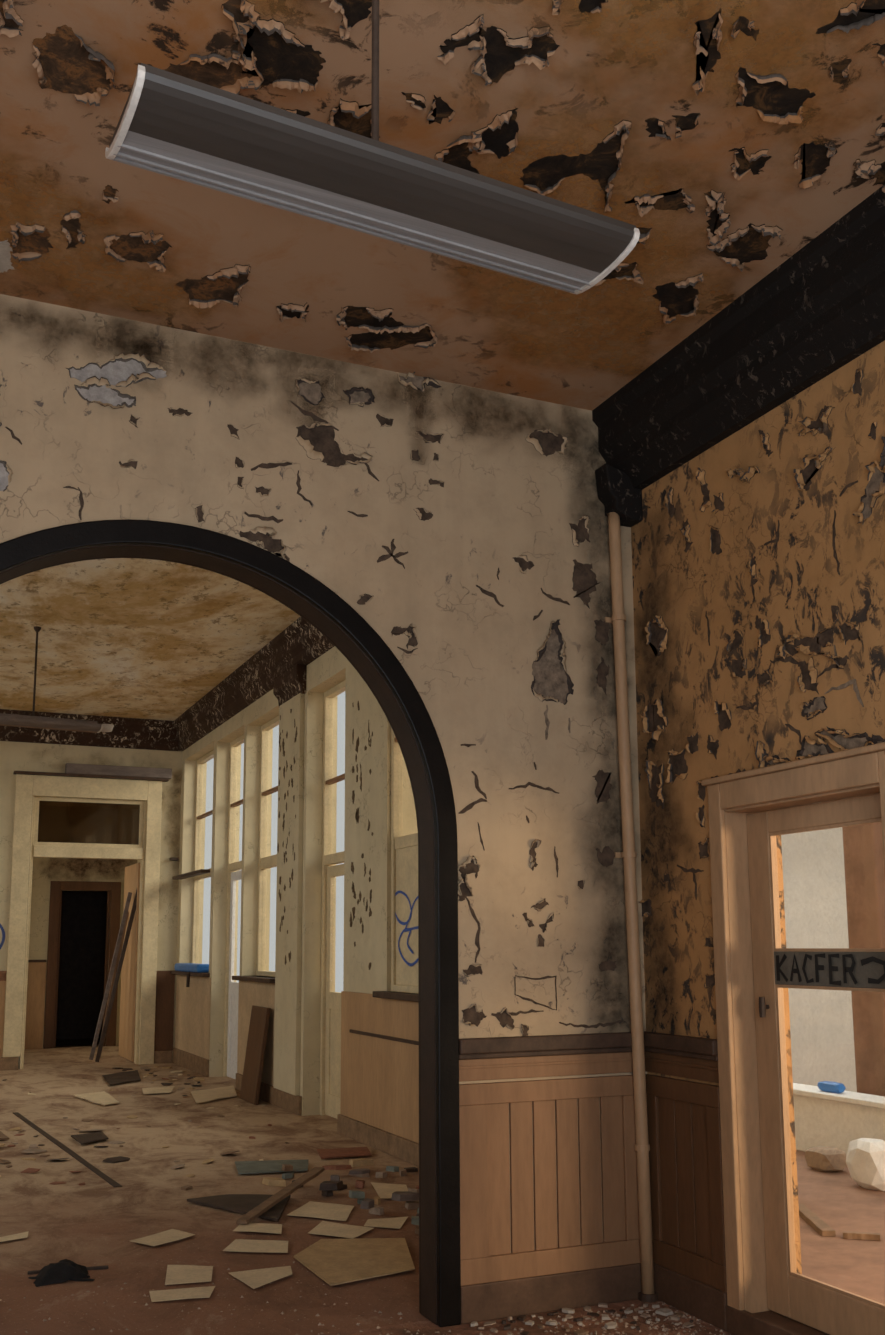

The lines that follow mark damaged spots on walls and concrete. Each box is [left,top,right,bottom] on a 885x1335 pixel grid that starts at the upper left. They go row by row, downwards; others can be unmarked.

peeling [0,0,115,106]
peeling [134,0,326,94]
peeling [435,108,519,174]
peeling [437,0,608,86]
peeling [735,67,816,124]
peeling [520,113,783,272]
water stain [9,310,167,363]
peeling [336,306,438,353]
water stain [454,387,572,455]
peeling [531,619,574,740]
peeling [726,605,885,768]
peeling [458,823,485,977]